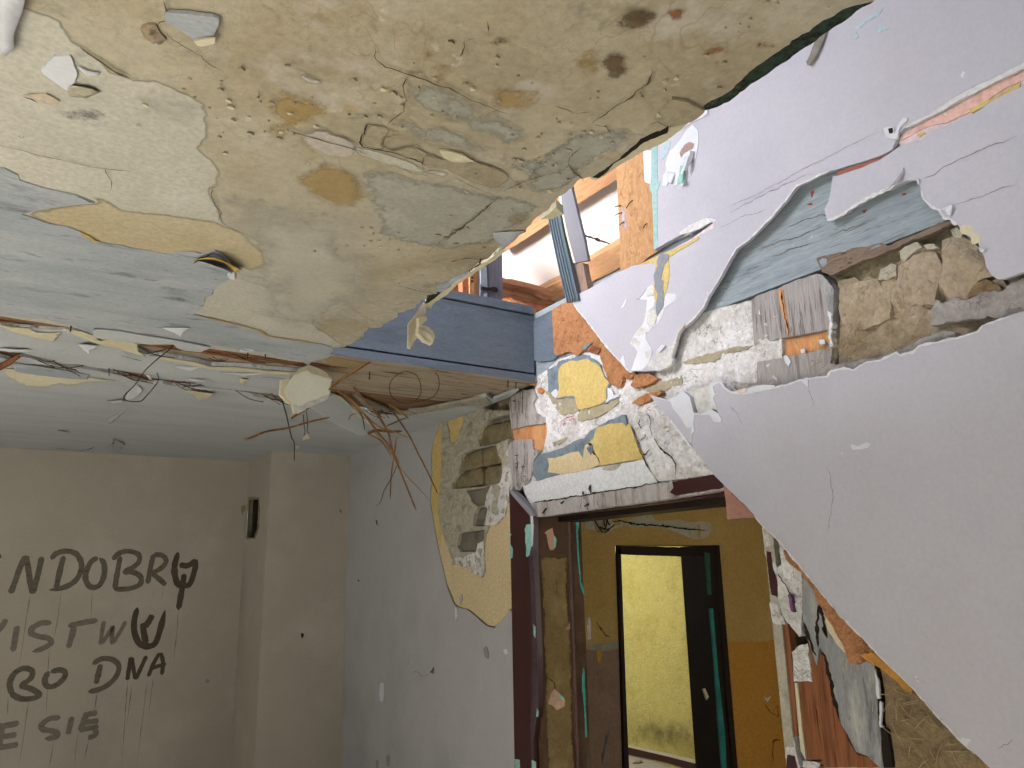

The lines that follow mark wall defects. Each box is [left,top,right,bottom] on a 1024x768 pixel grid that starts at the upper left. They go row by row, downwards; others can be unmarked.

water stain [619,11,655,28]
crack [373,45,514,122]
water stain [582,56,625,78]
crack [556,69,653,134]
peeling [0,8,365,348]
water stain [302,166,536,248]
crack [429,148,584,272]
crack [719,132,880,228]
peeling [0,315,302,401]
spalling [643,335,752,393]
peeling [533,353,644,481]
spalling [431,408,522,626]